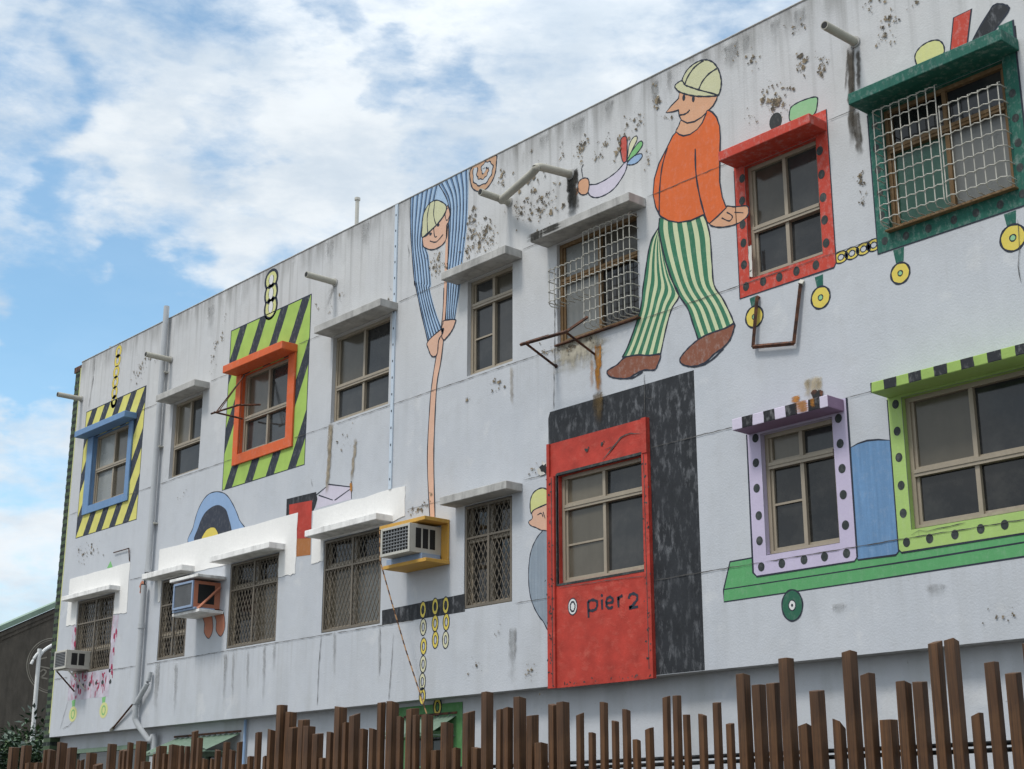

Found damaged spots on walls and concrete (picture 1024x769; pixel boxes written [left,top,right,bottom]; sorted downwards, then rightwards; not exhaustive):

peeling [862,0,919,47]
peeling [796,51,829,79]
peeling [744,82,795,124]
water stain [845,49,862,148]
peeling [454,149,569,264]
corrosion [594,345,602,415]
corrosion [792,378,818,412]